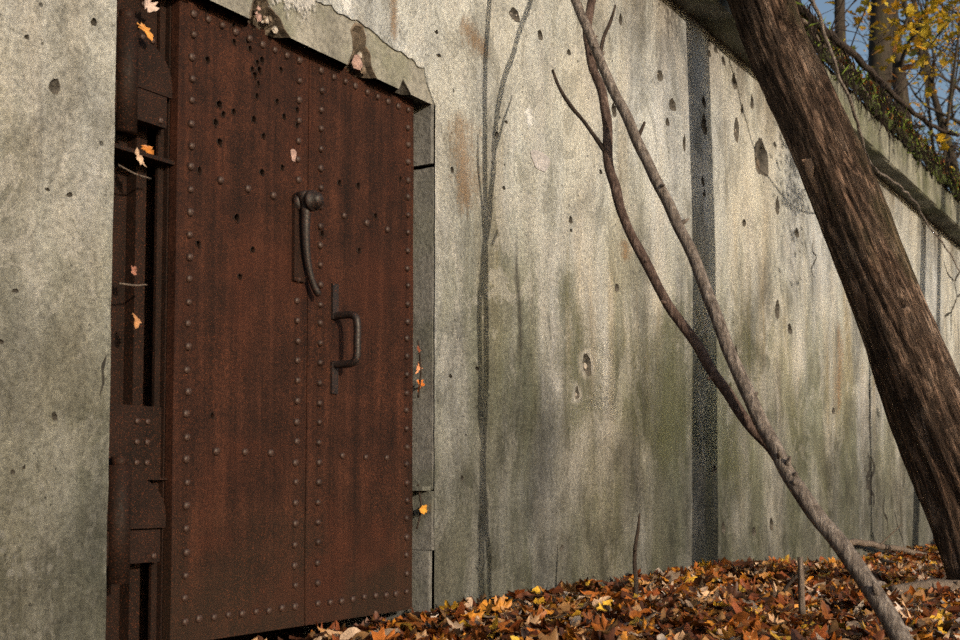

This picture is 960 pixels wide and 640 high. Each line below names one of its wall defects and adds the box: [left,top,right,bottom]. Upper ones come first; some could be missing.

peeling [202,0,435,106]
spalling [755,137,777,177]
spalling [583,353,592,376]